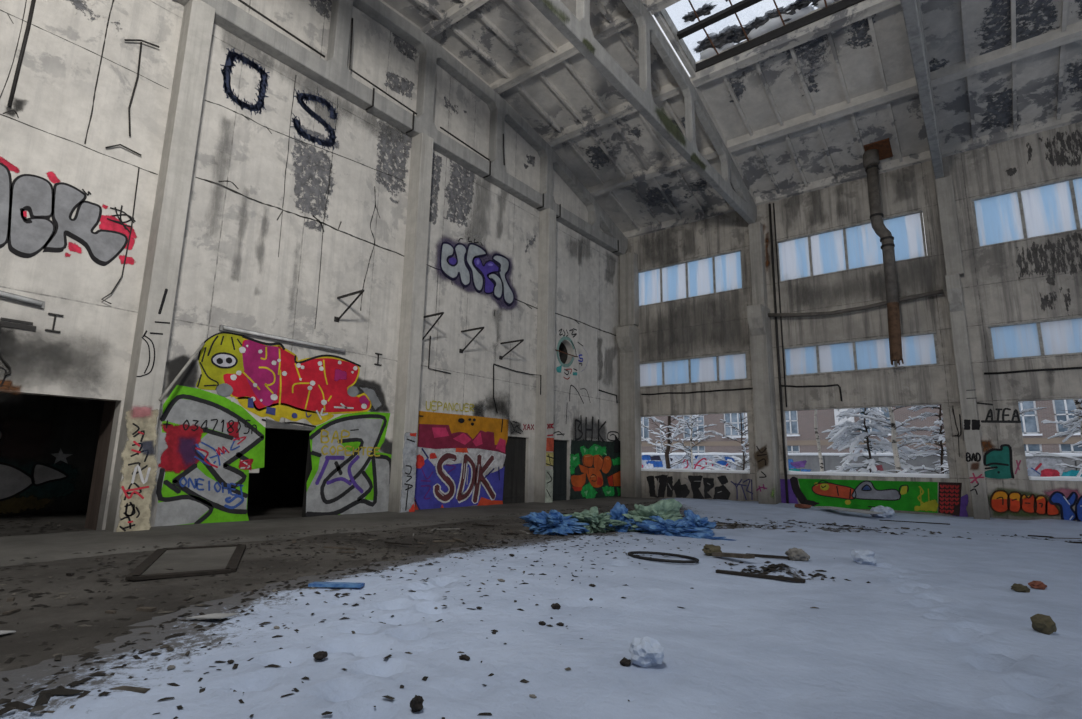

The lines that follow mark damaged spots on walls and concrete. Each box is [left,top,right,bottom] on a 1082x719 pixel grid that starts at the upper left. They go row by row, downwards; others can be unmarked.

peeling [974,0,1082,56]
peeling [929,58,948,72]
peeling [1067,62,1082,93]
peeling [981,85,1020,132]
peeling [288,125,339,232]
peeling [374,119,412,203]
peeling [1006,130,1082,176]
peeling [1016,232,1082,317]